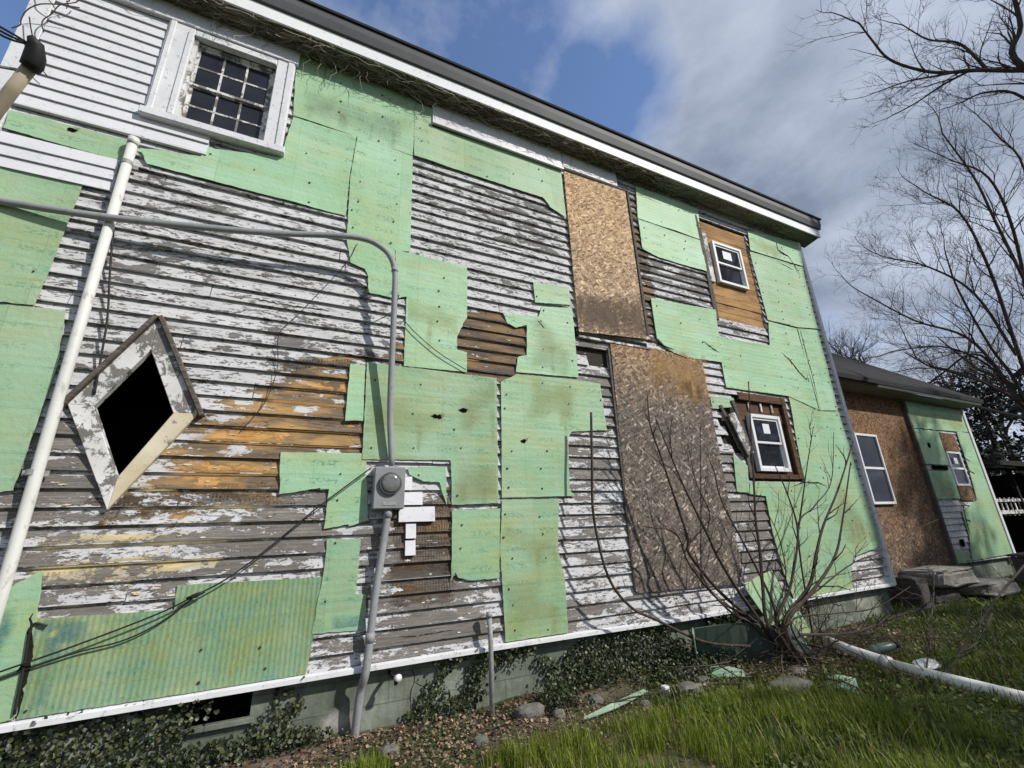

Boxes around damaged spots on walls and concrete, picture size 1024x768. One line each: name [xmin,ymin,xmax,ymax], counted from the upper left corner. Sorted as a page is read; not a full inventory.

peeling [457,269,528,383]
peeling [414,166,572,274]
peeling [575,337,610,354]
peeling [628,197,712,346]
peeling [12,165,505,671]
peeling [0,428,40,568]
peeling [558,368,708,634]